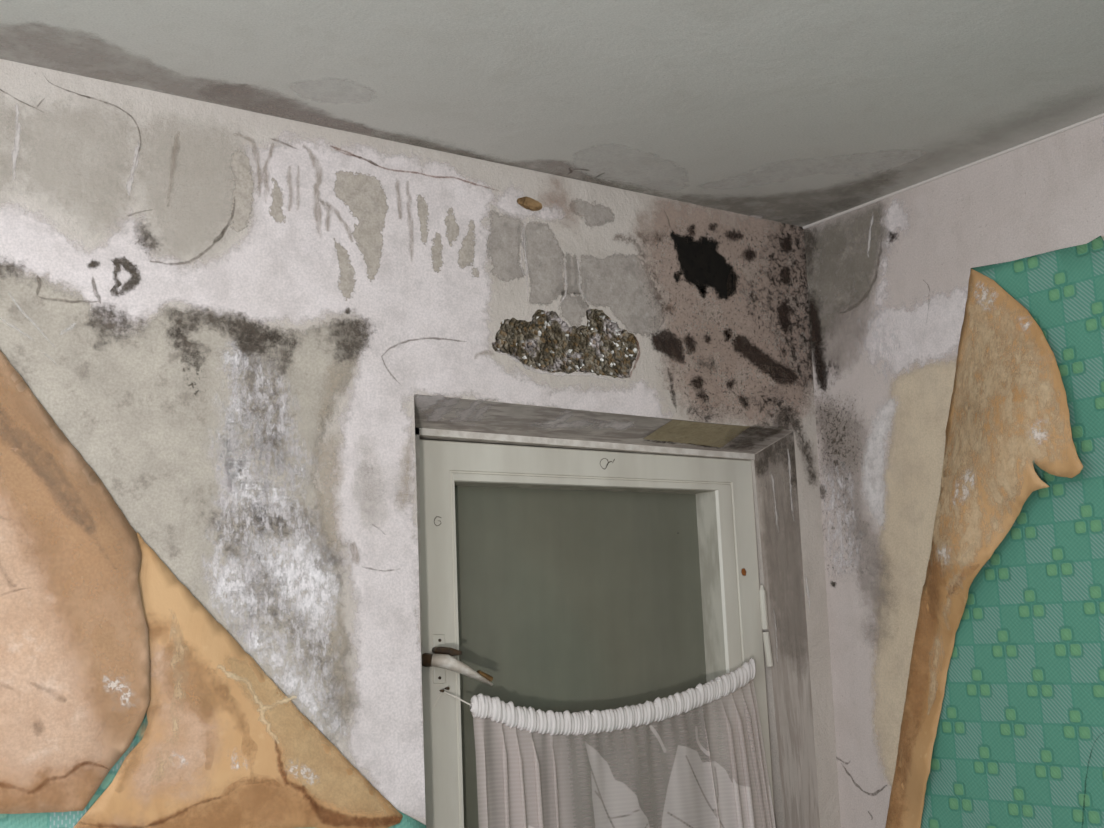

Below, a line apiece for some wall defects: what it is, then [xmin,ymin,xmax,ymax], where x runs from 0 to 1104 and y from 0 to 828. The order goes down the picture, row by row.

leakage [0,31,377,137]
leakage [89,307,141,337]
leakage [110,258,140,296]
peeling [229,150,254,232]
peeling [269,178,286,223]
leakage [330,308,370,391]
peeling [334,171,389,301]
peeling [417,187,665,381]
leakage [628,200,909,587]
peeling [0,265,403,828]
leakage [168,310,345,734]
peeling [862,269,1083,828]